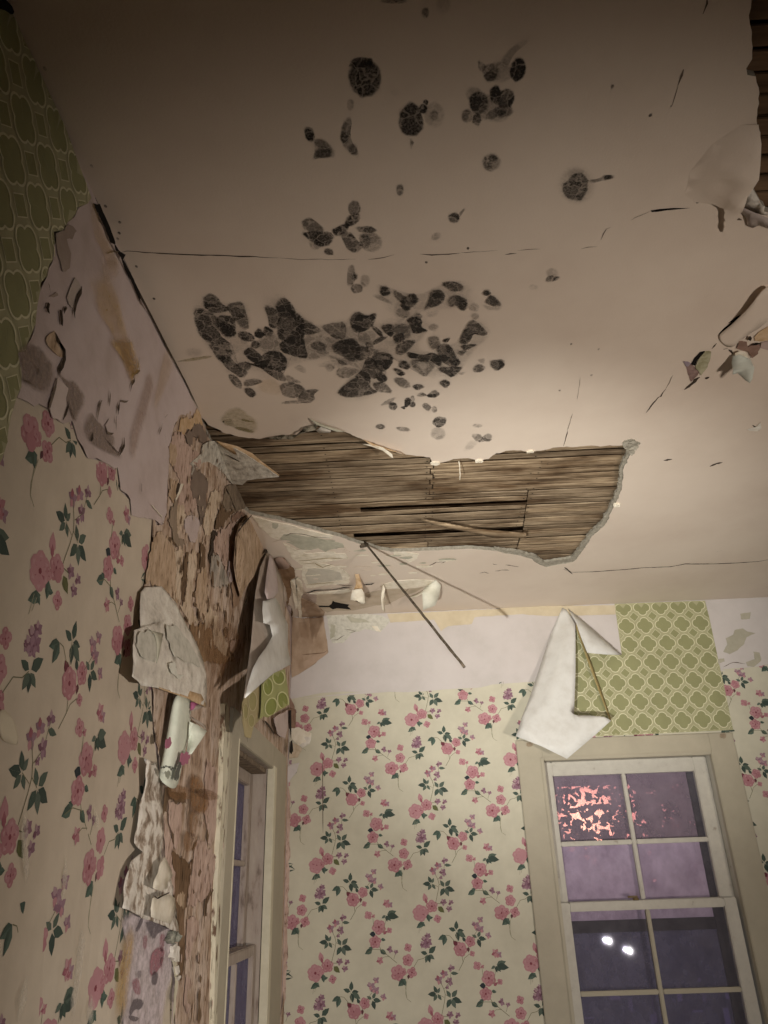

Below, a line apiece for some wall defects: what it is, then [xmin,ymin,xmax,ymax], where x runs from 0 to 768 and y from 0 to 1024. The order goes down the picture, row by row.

damp [399,100,428,143]
damp [463,58,526,125]
crack [107,250,346,260]
damp [303,201,377,255]
crack [632,208,687,220]
crack [24,284,140,456]
peeling [17,203,209,525]
damp [185,282,505,427]
crack [564,564,684,574]
peeling [252,516,558,698]
peeling [571,604,622,654]
peeling [122,698,230,1024]